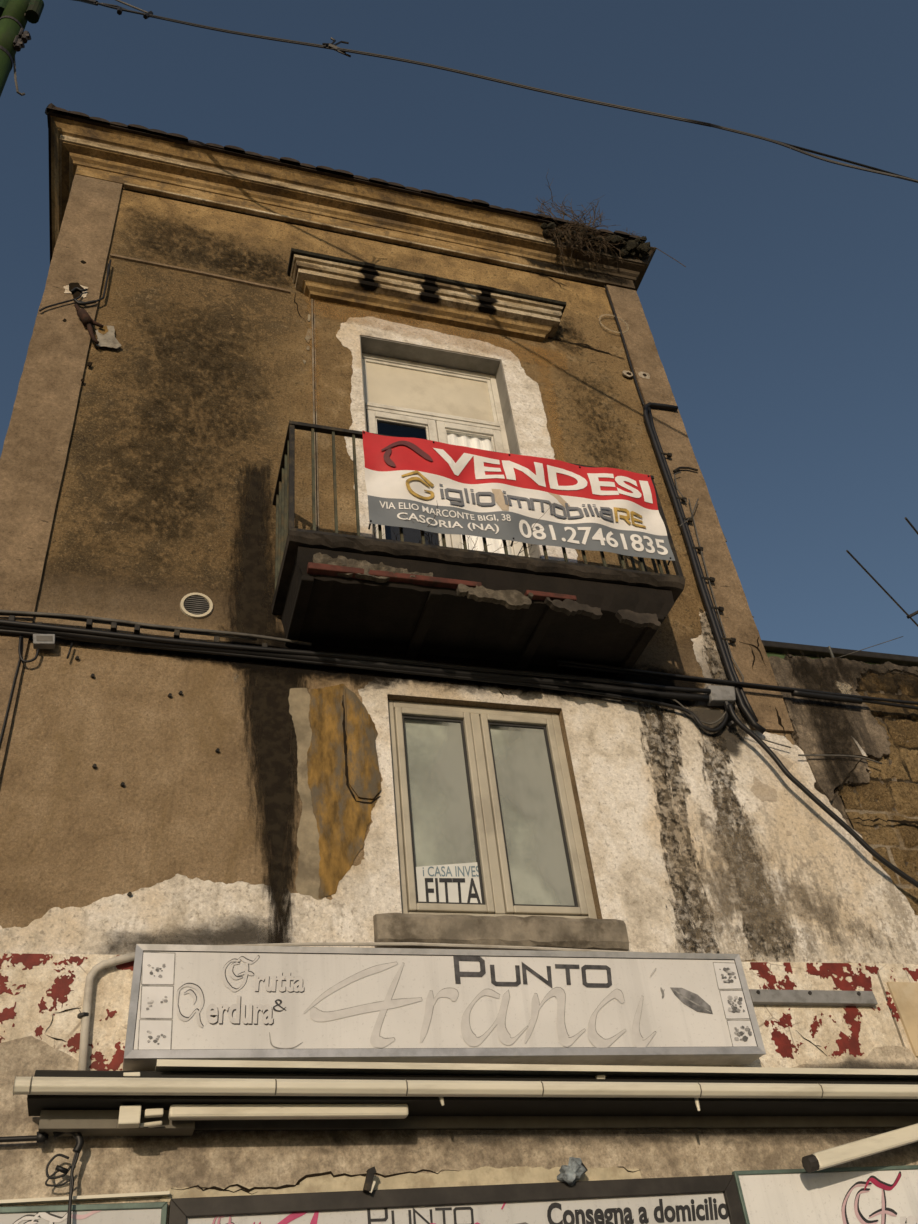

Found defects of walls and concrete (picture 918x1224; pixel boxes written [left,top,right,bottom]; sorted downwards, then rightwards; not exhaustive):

leakage [138,214,288,284]
leakage [118,312,249,536]
flaking render [336,316,555,537]
spalling [313,552,433,583]
flaking render [539,545,578,563]
spalling [456,584,661,630]
leakage [55,465,892,960]
flaking render [0,611,918,1059]
peeling [63,1033,125,1071]
crack [171,1169,456,1194]